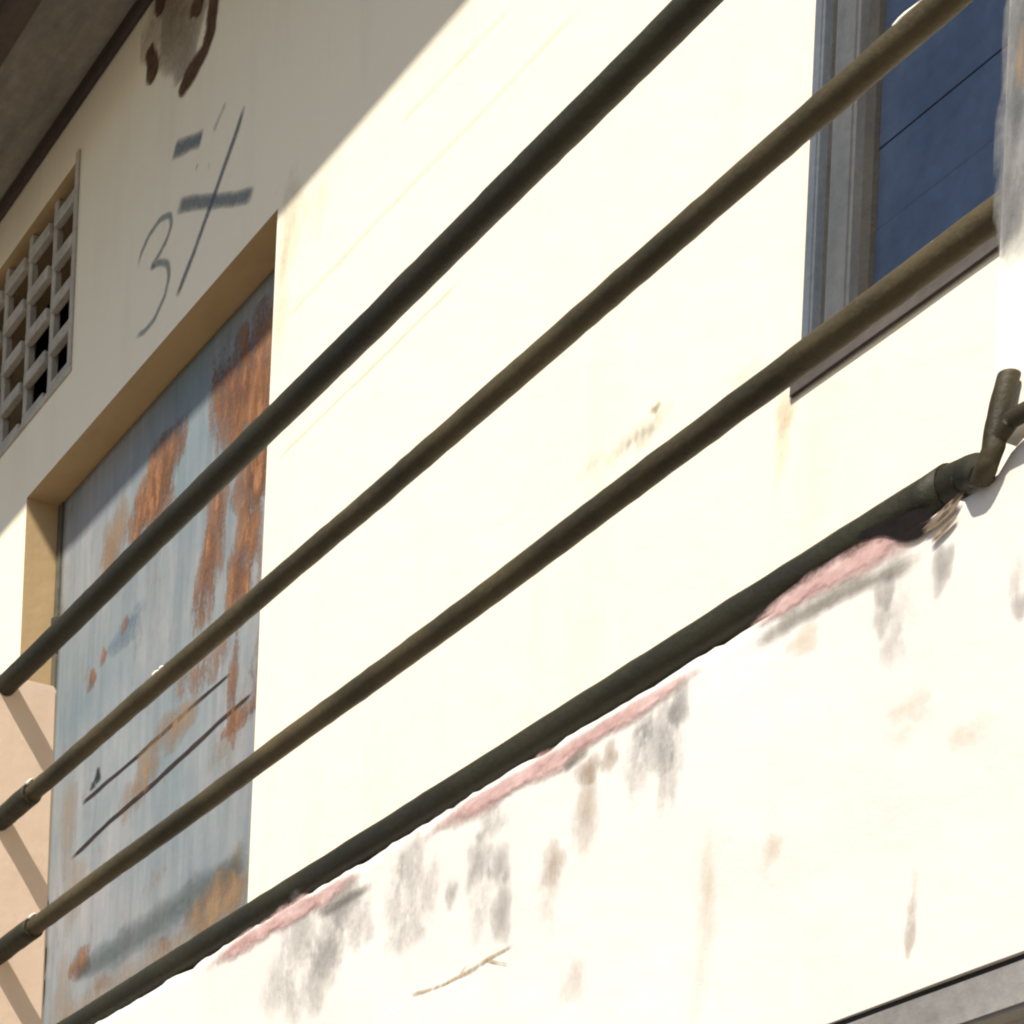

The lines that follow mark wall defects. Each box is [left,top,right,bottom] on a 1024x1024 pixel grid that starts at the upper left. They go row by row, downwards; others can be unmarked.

rust [210,300,273,448]
rust [106,431,186,567]
rust [194,447,267,626]
spalling [761,495,961,637]
rust [179,642,254,750]
spalling [437,675,687,829]
rust [68,947,89,978]
rust [191,867,242,930]
spalling [219,879,365,958]